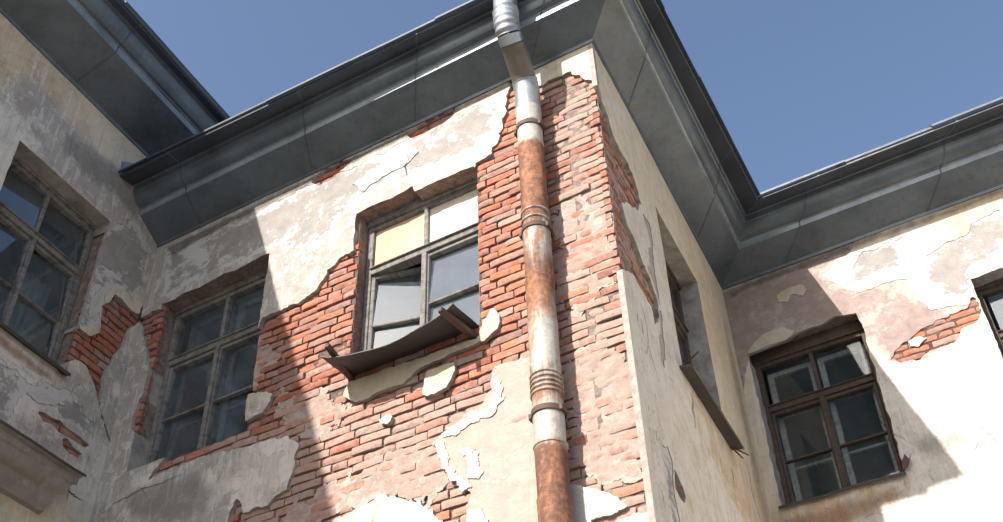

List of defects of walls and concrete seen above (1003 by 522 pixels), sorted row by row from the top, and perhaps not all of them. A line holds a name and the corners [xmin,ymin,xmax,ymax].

flaking render [63,83,538,522]
flaking render [539,76,665,522]
flaking render [662,446,680,522]
flaking render [723,210,1003,390]